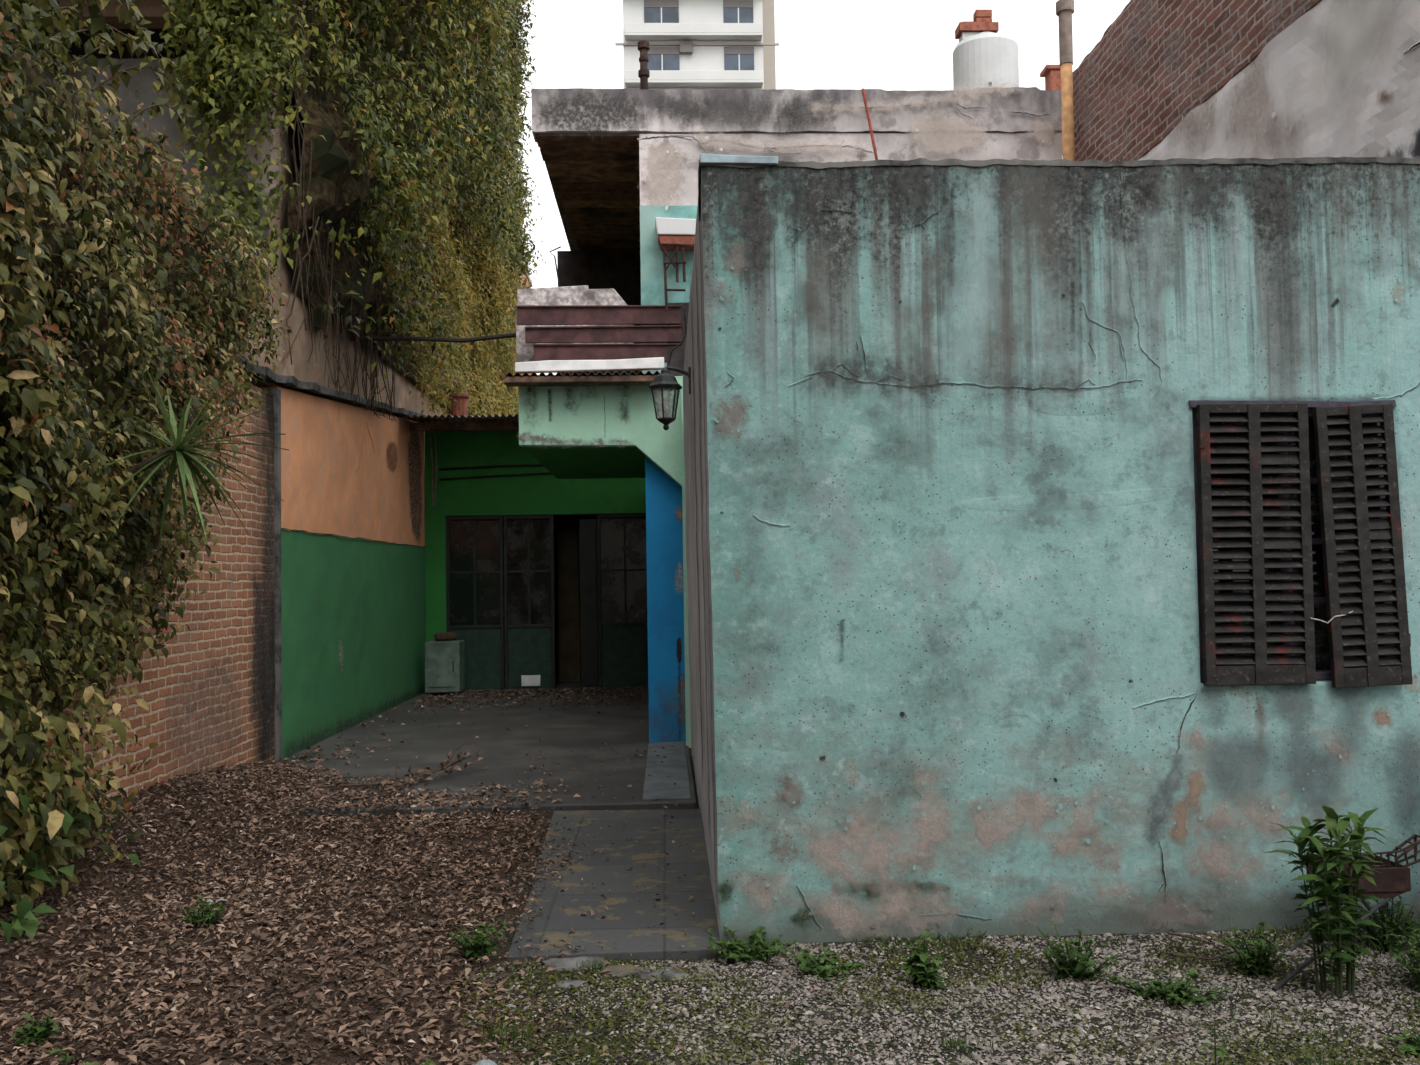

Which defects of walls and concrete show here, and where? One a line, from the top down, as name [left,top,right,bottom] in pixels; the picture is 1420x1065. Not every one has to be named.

water stain [717,167,850,282]
crack [788,158,1163,395]
water stain [820,357,940,392]
crack [1372,381,1420,401]
crack [1132,689,1199,758]
peeling [1171,771,1205,844]
peeling [809,887,958,936]
crack [1155,841,1176,926]